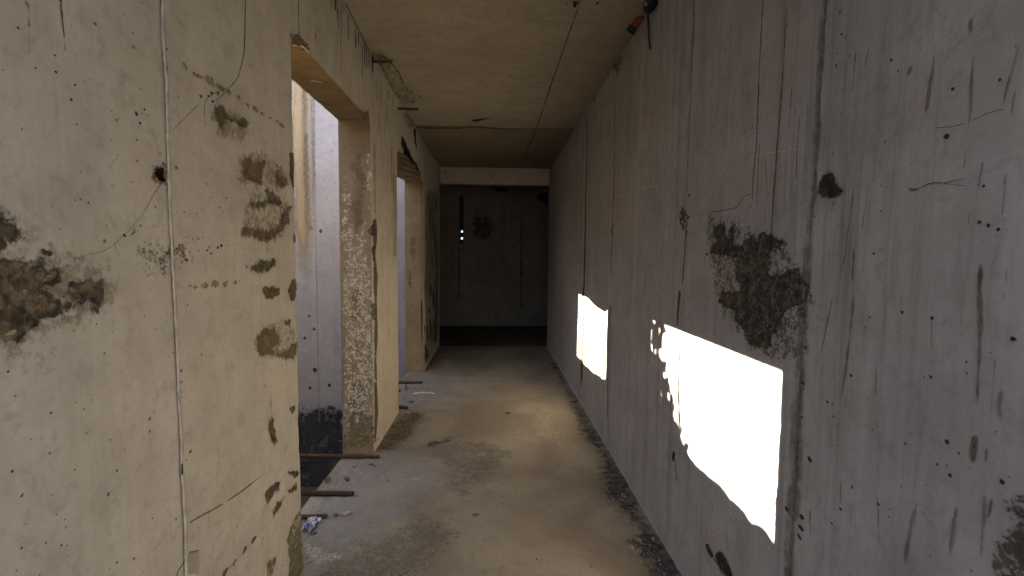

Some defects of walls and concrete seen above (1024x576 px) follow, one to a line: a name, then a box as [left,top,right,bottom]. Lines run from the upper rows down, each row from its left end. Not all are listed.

spalling [212,105,248,140]
spalling [238,152,296,243]
spalling [818,172,843,204]
spalling [0,212,112,344]
spalling [706,215,814,363]
spalling [255,319,297,360]